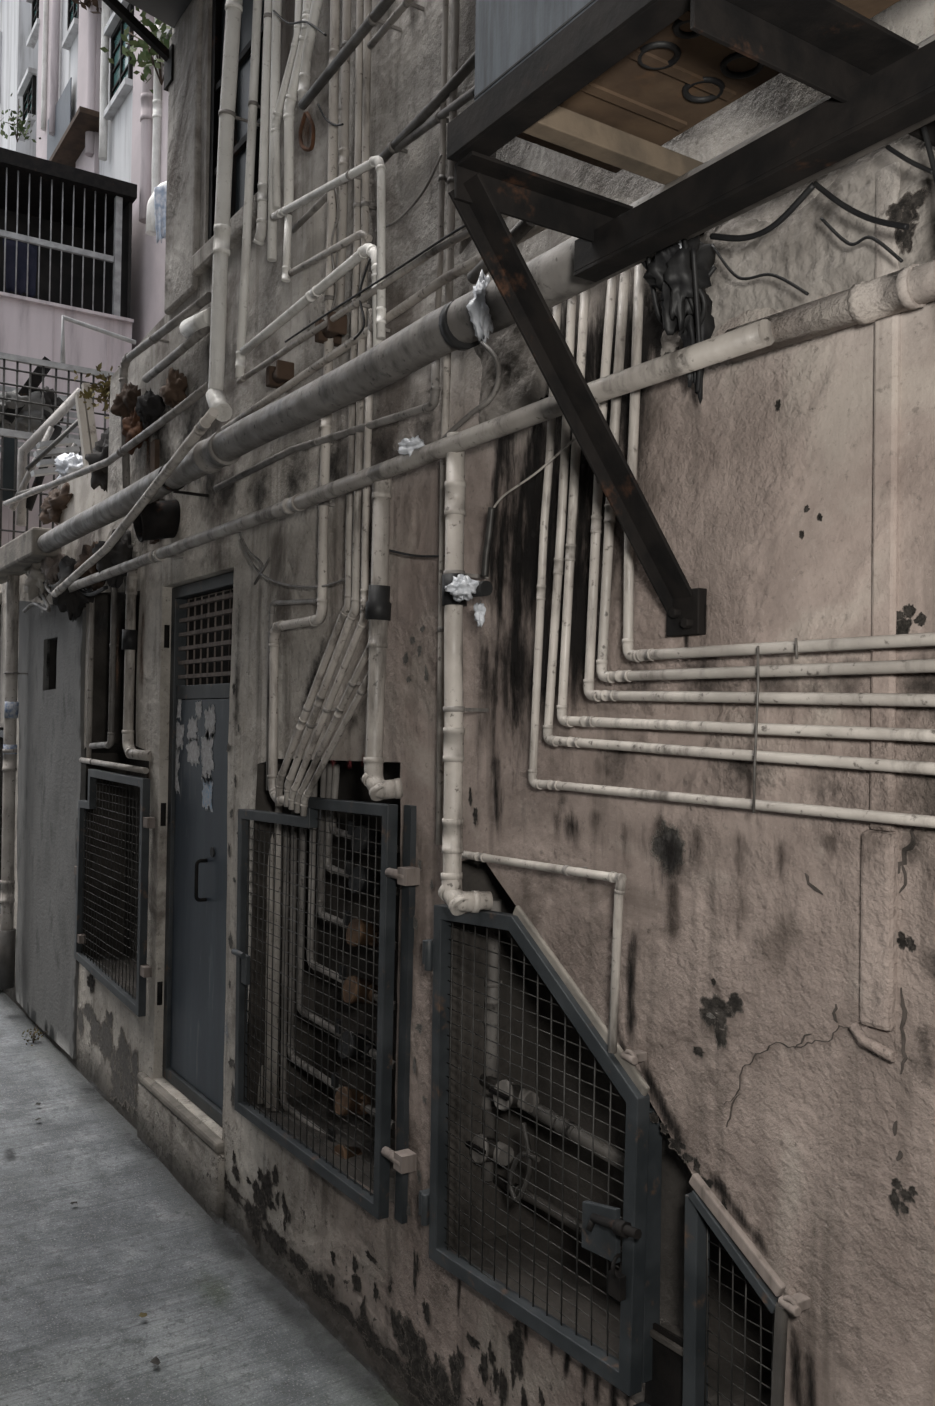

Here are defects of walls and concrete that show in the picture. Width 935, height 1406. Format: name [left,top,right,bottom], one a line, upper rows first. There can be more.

leakage [576,283,682,383]
leakage [606,388,645,461]
leakage [481,416,617,737]
leakage [651,820,699,934]
peeling [77,973,139,1112]
flaking render [693,978,744,1058]
crack [724,1004,849,1127]
flaking render [889,1178,918,1216]
leakage [551,1343,630,1406]